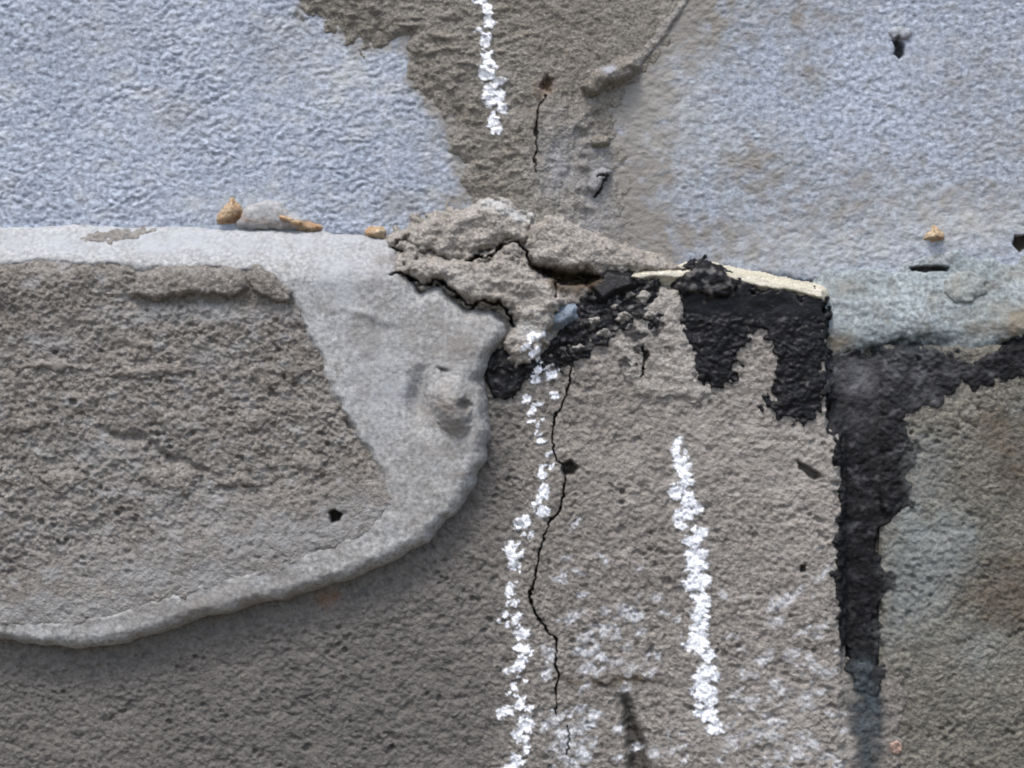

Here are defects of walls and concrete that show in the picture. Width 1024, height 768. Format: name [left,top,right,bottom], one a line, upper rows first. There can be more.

spalling [0,259,392,627]
crack [528,368,572,755]
water stain [848,659,882,768]
water stain [897,530,969,624]